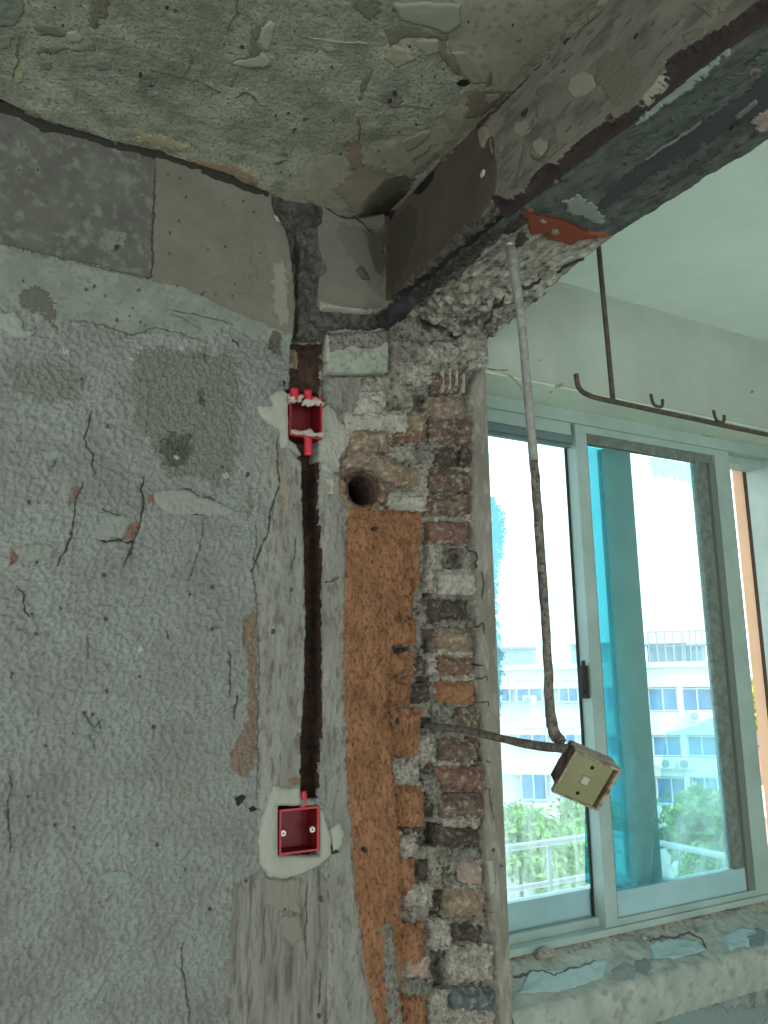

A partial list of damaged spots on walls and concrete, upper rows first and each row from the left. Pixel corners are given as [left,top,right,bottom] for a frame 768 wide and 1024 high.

peeling [233,20,275,68]
peeling [392,1,501,105]
crack [0,36,272,279]
spalling [477,0,768,248]
spalling [0,279,58,339]
crack [57,411,96,567]
crack [100,475,145,567]
crack [183,438,339,798]
peeling [484,848,503,896]
crack [513,960,596,978]
peeling [518,938,707,994]
peeling [722,927,766,951]